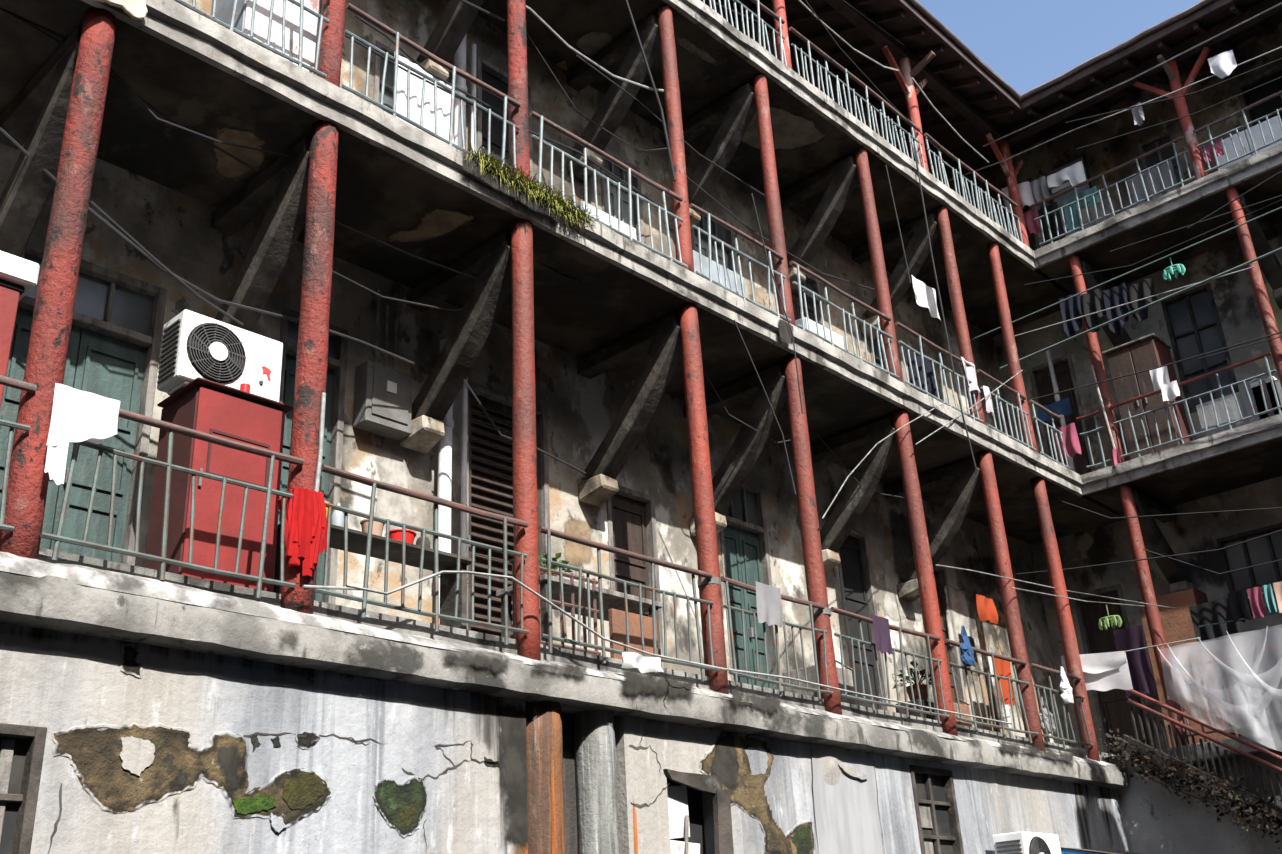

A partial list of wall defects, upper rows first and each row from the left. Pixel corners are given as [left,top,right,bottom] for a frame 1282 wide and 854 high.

damp [282,631,298,643]
damp [445,651,509,672]
peeling [51,722,333,833]
crack [243,732,500,781]
corrosion [552,769,563,854]
peeling [699,730,816,854]